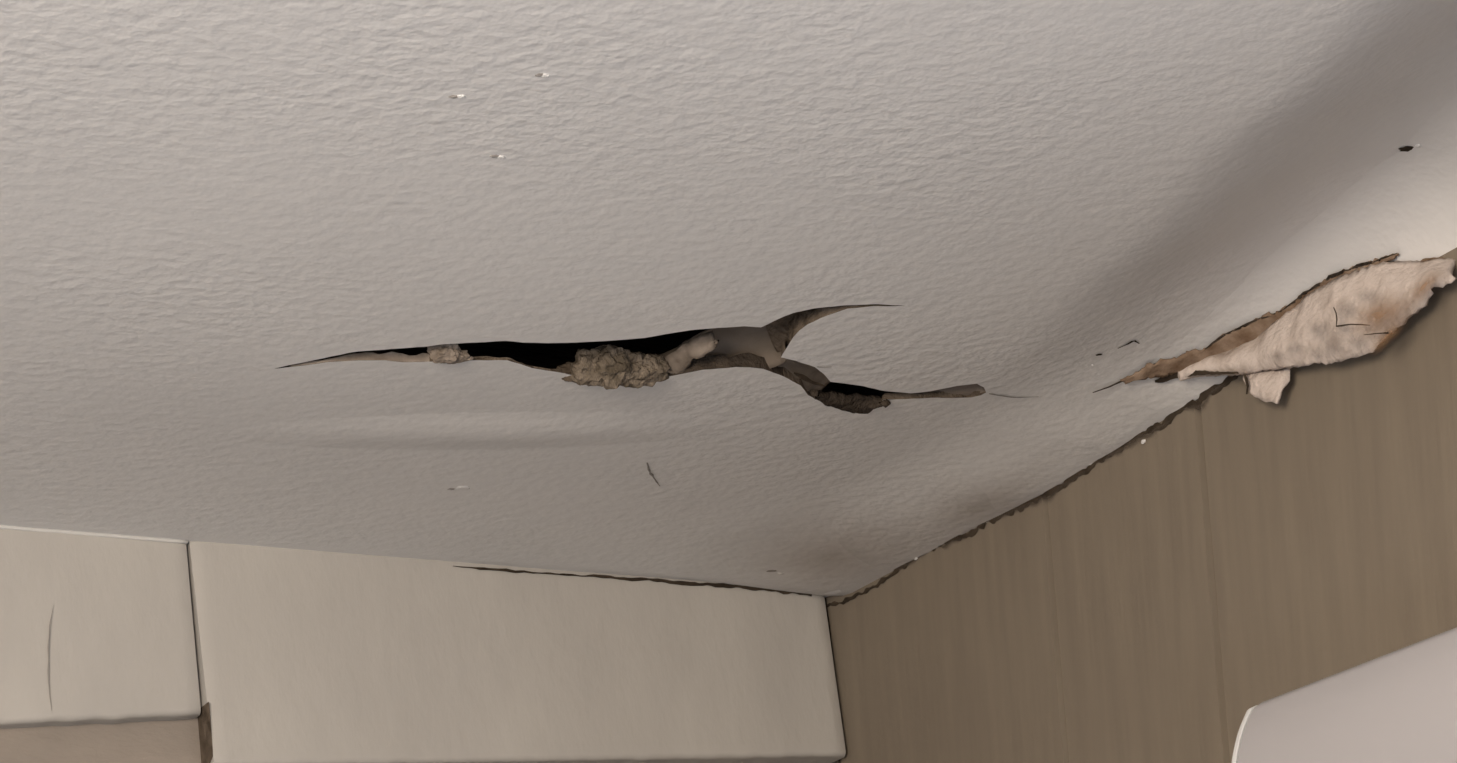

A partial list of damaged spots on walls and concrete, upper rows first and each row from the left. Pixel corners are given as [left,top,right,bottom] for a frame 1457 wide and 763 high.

crack [275,304,1039,414]
flaking render [1093,253,1457,404]